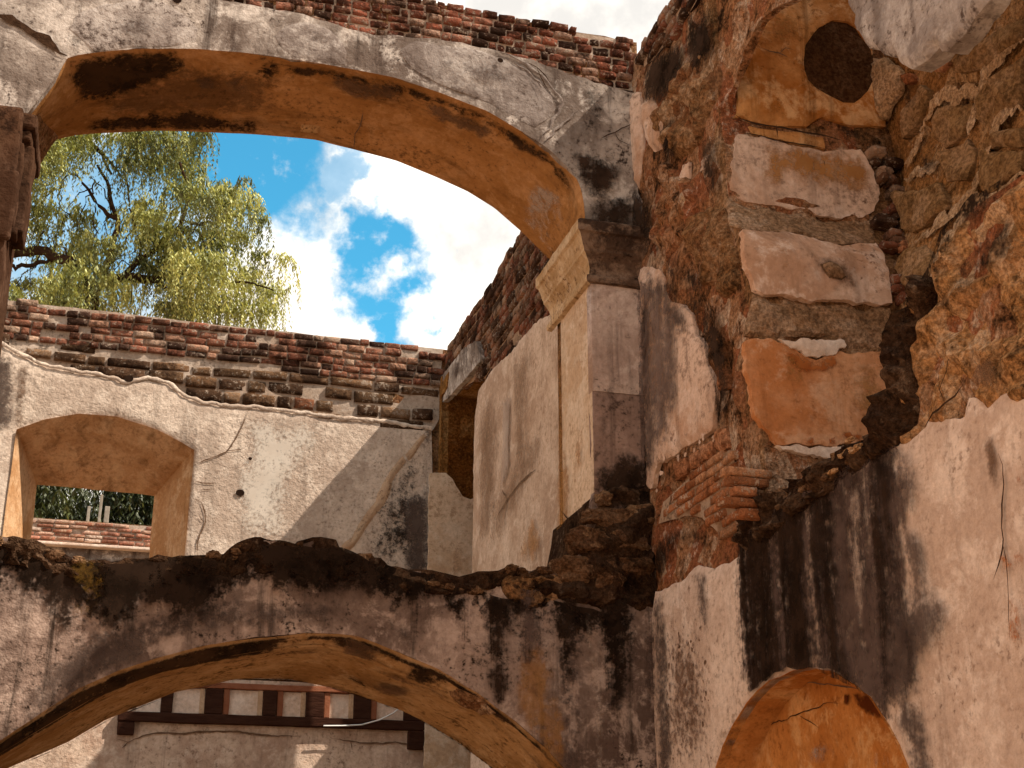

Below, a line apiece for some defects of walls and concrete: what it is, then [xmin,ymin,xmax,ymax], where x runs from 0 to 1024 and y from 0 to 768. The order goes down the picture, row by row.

leakage [71,52,569,188]
spalling [649,50,875,298]
spalling [804,21,873,103]
leakage [577,154,727,509]
spalling [743,294,891,359]
peeling [650,434,715,493]
peeling [827,436,863,476]
leakage [0,421,633,768]
spalling [501,575,562,609]
leakage [737,446,942,768]
crack [994,454,1010,637]
crack [771,682,857,726]